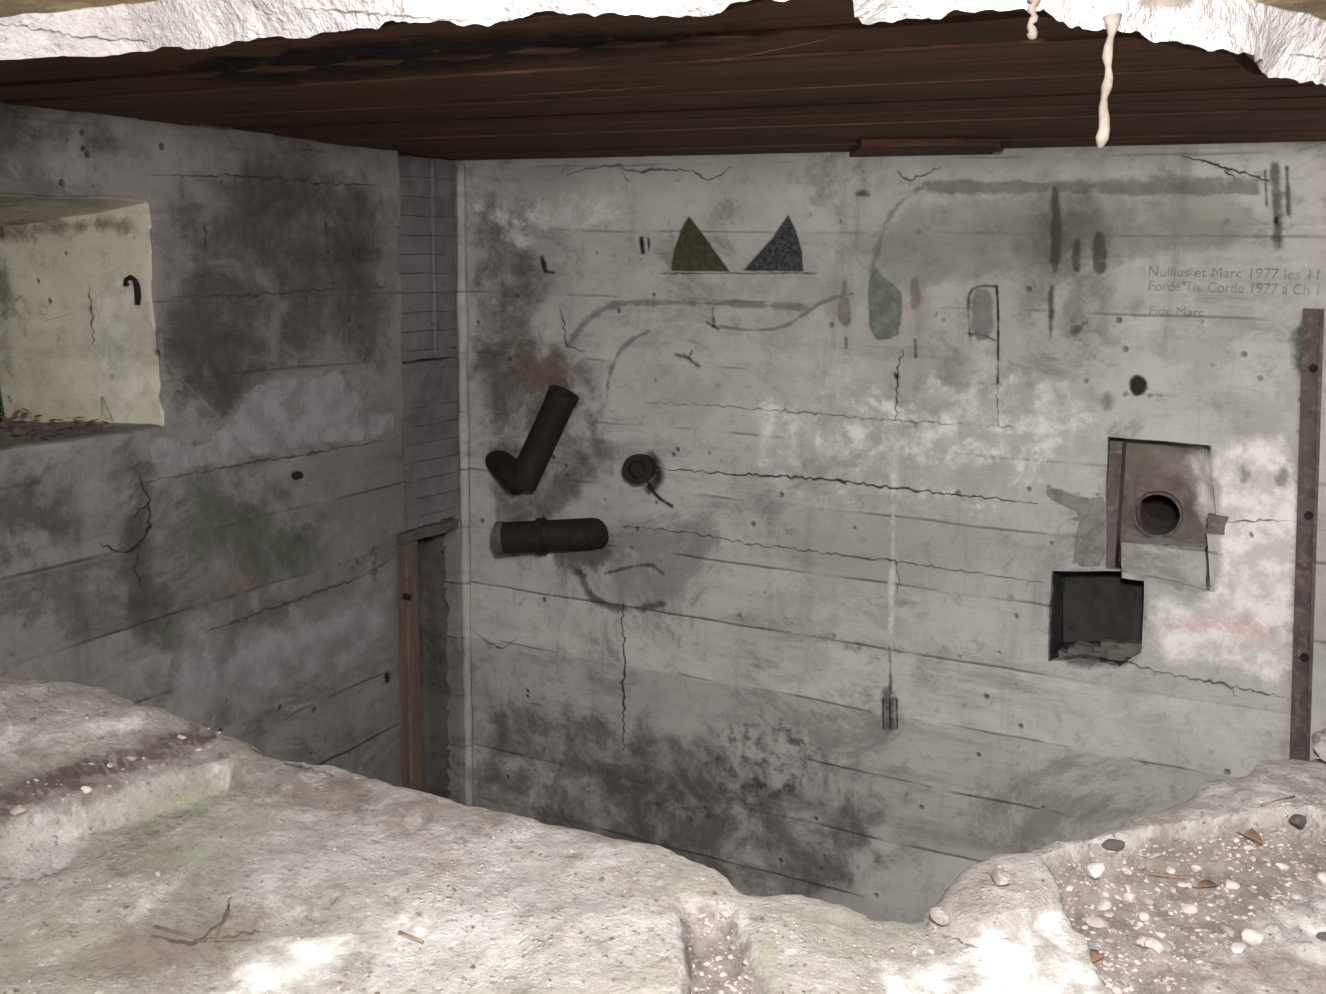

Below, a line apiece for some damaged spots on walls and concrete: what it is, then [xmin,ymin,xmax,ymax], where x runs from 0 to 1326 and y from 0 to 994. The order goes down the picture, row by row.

damp [204,168,381,357]
damp [171,269,263,412]
damp [118,589,392,706]
crack [619,604,627,748]
damp [537,789,584,829]
damp [560,720,866,893]